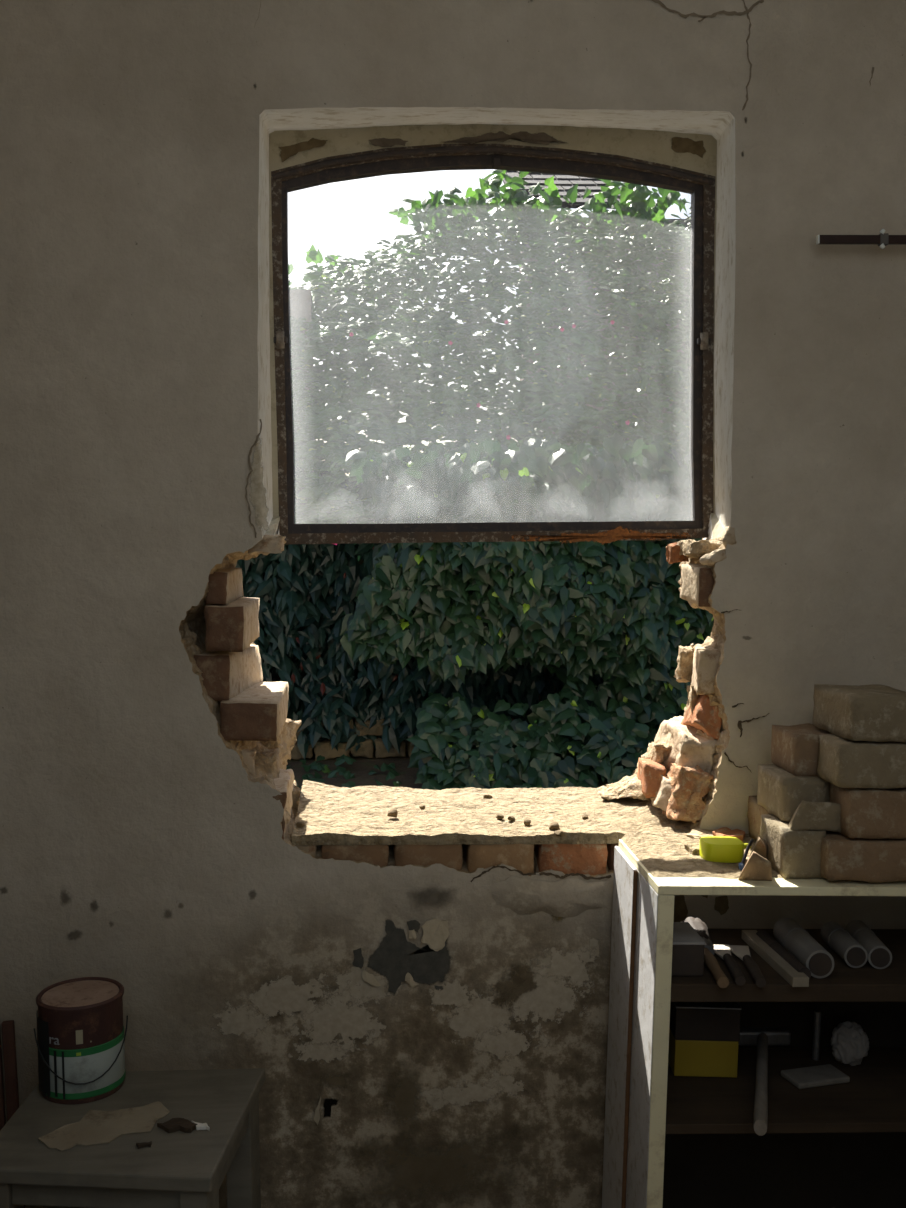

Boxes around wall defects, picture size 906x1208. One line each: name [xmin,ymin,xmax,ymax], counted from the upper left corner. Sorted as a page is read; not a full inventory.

crack [652,0,764,110]
peeling [671,137,706,158]
flaking render [245,419,286,555]
spalling [666,526,736,607]
spalling [194,568,722,876]
water stain [414,889,449,905]
spalling [712,827,772,881]
peeling [352,918,451,994]
water stain [212,961,403,1088]
water stain [350,938,600,1208]